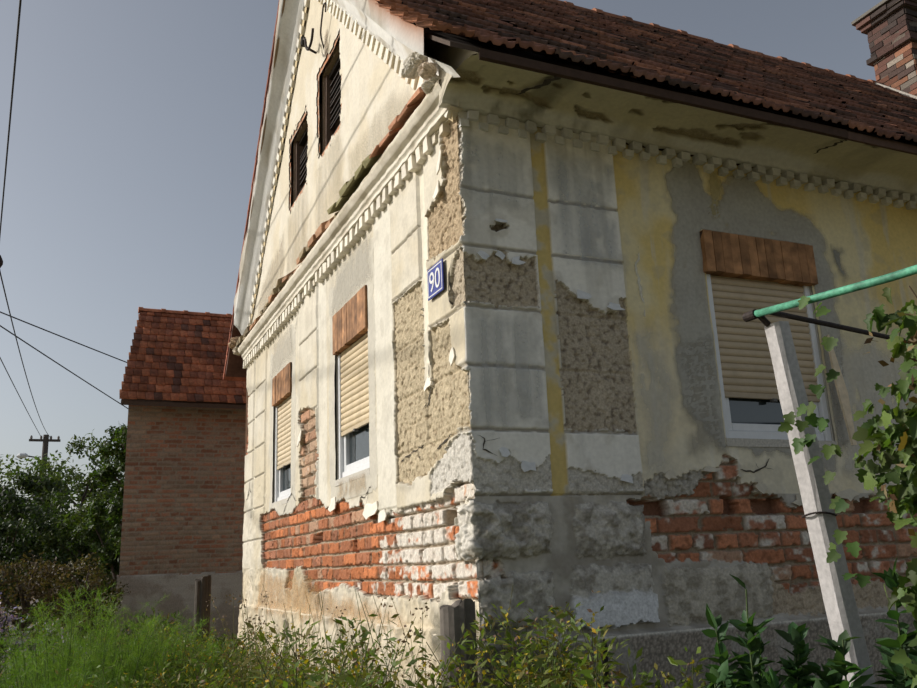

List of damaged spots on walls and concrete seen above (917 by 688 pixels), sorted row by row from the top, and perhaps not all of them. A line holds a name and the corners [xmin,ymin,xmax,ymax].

flaking render [426,112,541,309]
flaking render [261,281,552,600]
flaking render [554,279,638,435]
flaking render [568,454,826,616]
water stain [666,161,909,472]
flaking render [831,482,917,609]